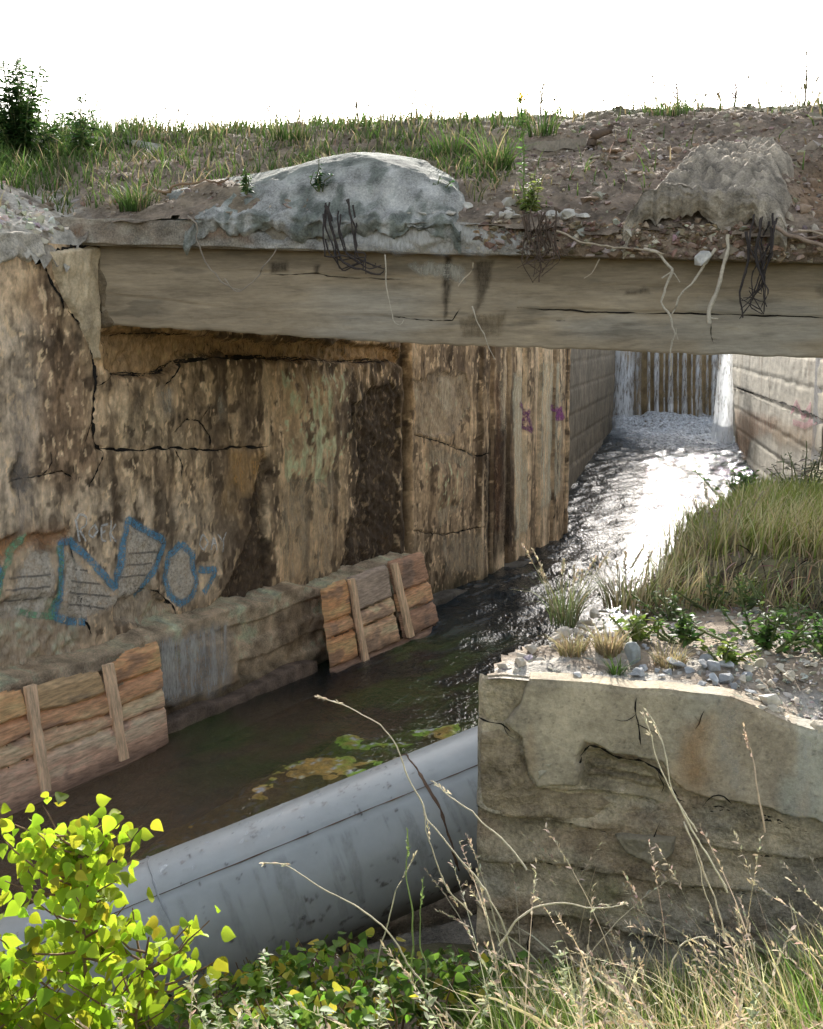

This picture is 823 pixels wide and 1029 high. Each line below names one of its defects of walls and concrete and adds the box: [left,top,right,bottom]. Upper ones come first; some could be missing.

crack [8,244,388,510]
crack [416,435,488,458]
crack [417,526,482,536]